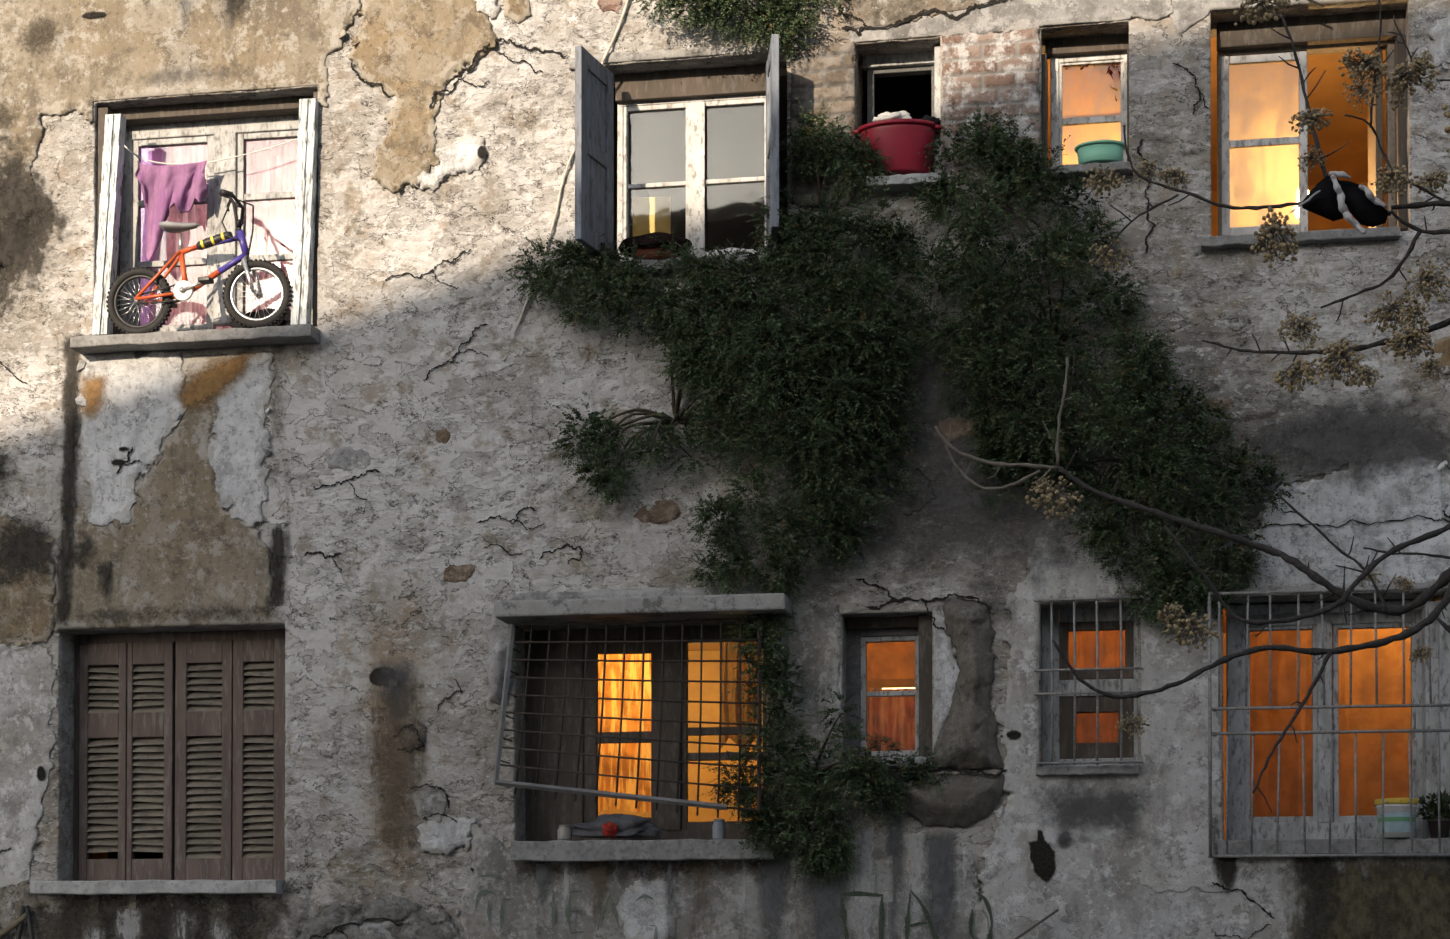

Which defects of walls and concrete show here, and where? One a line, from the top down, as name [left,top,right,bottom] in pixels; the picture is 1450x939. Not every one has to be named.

leakage [0,109,68,315]
leakage [22,20,54,56]
leakage [228,0,247,16]
flaking render [0,0,532,193]
spalling [942,28,1040,196]
crack [1137,138,1163,253]
flaking render [1243,404,1450,597]
flaking render [0,351,285,939]
leakage [371,662,421,850]
crack [855,578,992,631]
flaking render [836,492,1449,939]
leakage [1296,857,1340,939]